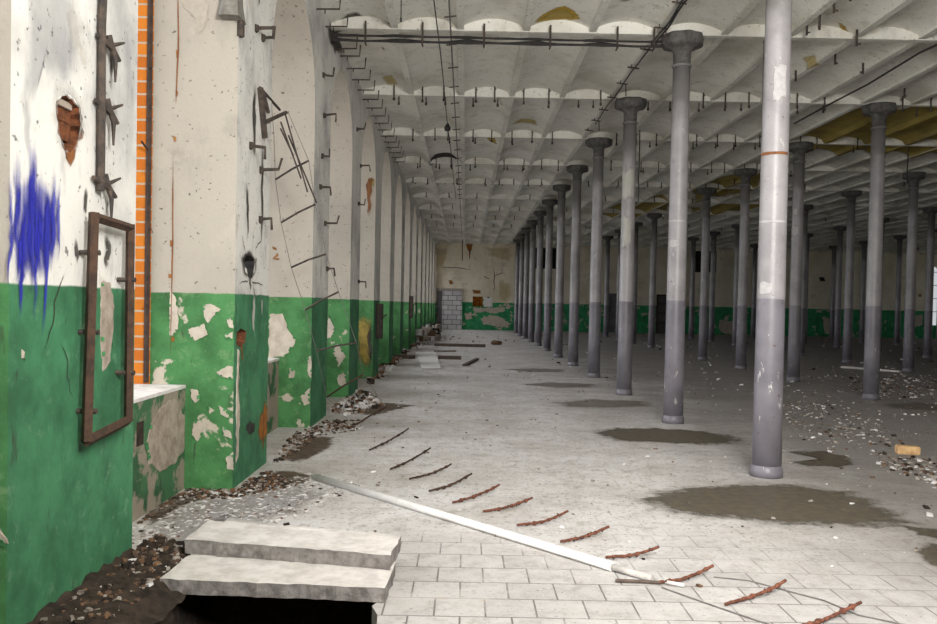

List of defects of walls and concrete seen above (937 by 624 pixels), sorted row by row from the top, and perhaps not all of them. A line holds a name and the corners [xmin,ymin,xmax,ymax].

hole [242,252,257,289]
peeling [465,297,511,328]
peeling [268,313,295,358]
water stain [359,320,373,364]
peeling [169,292,246,470]
peeling [300,355,312,406]
peeling [136,399,203,472]
rust [246,403,267,449]
water stain [596,428,739,445]
water stain [642,485,937,566]
hole [199,595,377,624]